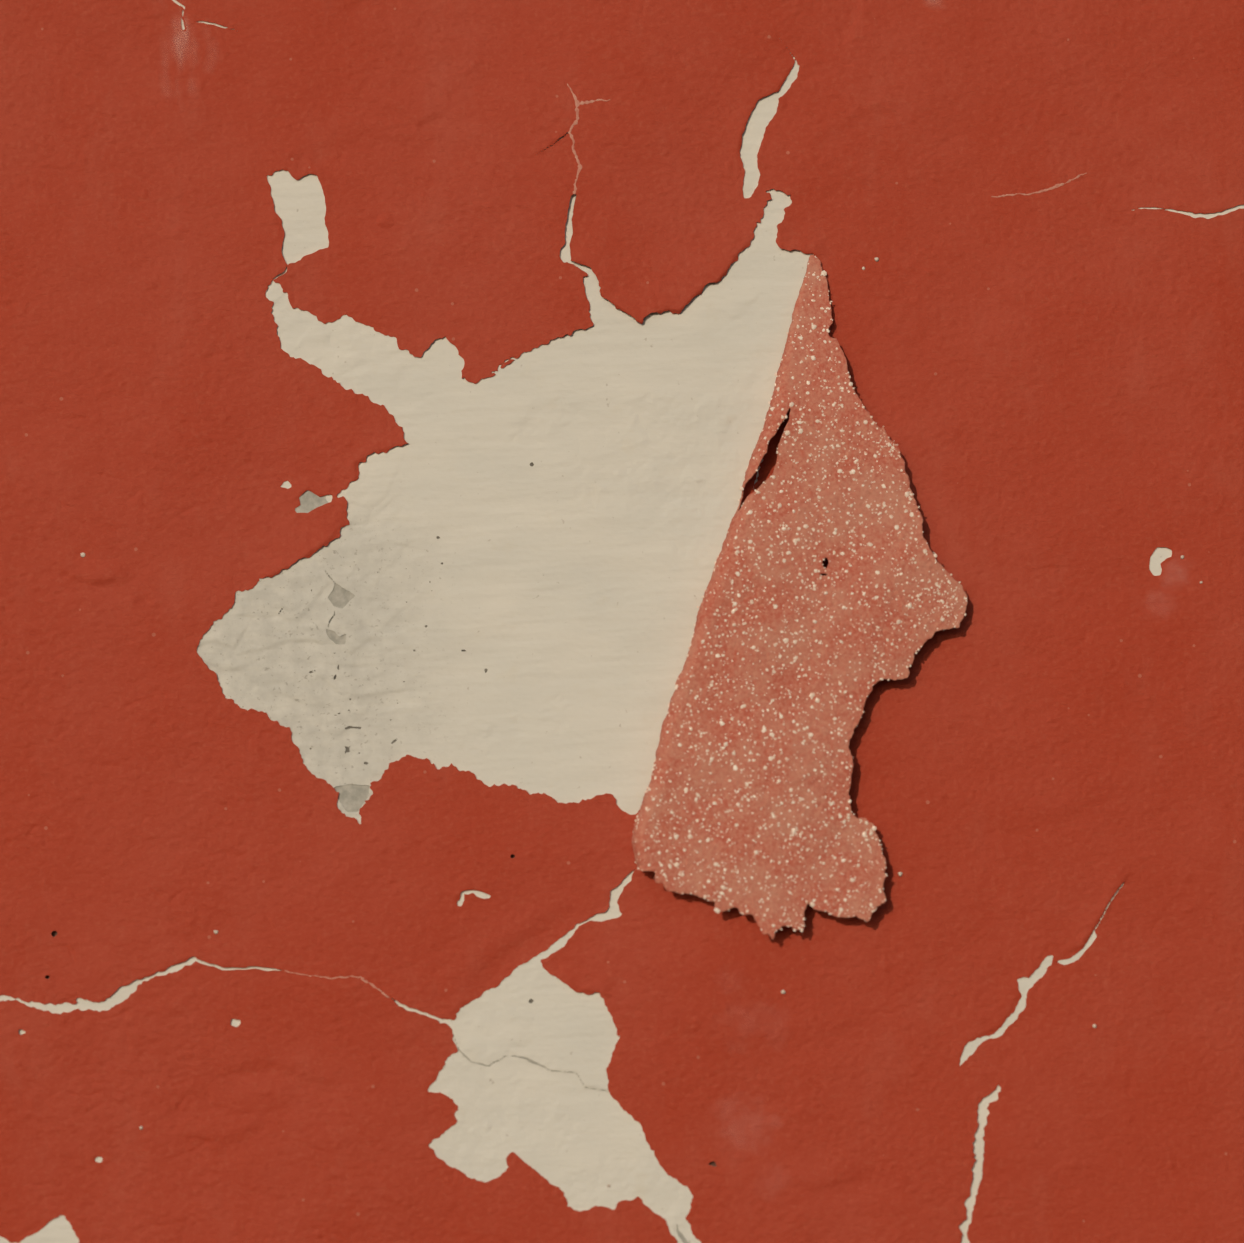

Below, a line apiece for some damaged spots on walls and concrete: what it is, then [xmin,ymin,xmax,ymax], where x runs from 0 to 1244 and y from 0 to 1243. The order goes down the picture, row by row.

peeling [197,38,968,1243]
peeling [1149,547,1172,576]
crack [0,956,441,1020]
crack [959,882,1124,1065]
peeling [0,1215,79,1243]
crack [959,1085,1001,1243]